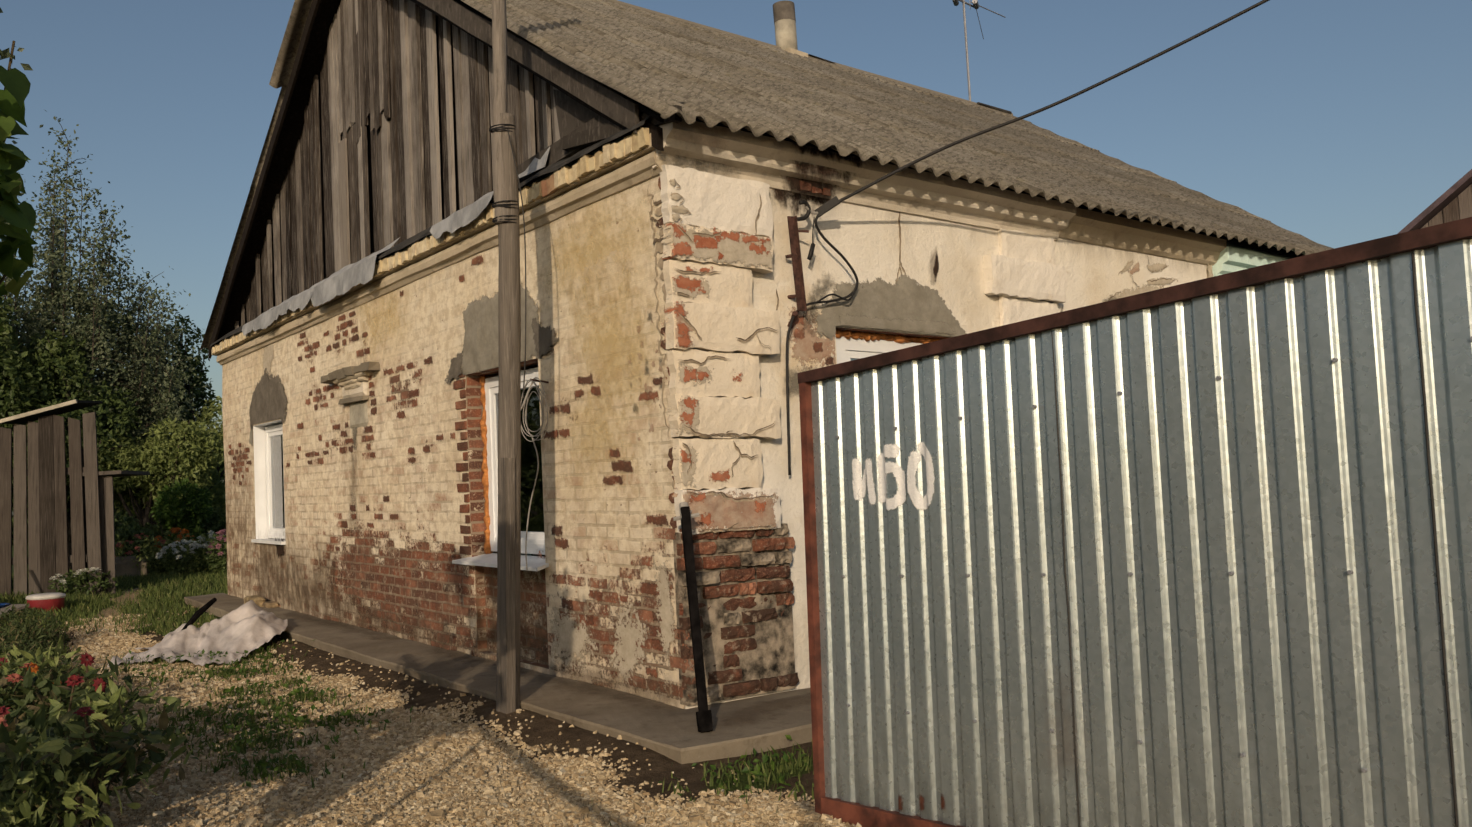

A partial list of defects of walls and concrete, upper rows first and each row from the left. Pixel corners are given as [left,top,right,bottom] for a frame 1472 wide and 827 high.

leakage [773,140,862,215]
spalling [1108,258,1178,301]
peeling [788,307,836,368]
peeling [286,311,433,467]
spalling [538,178,799,706]